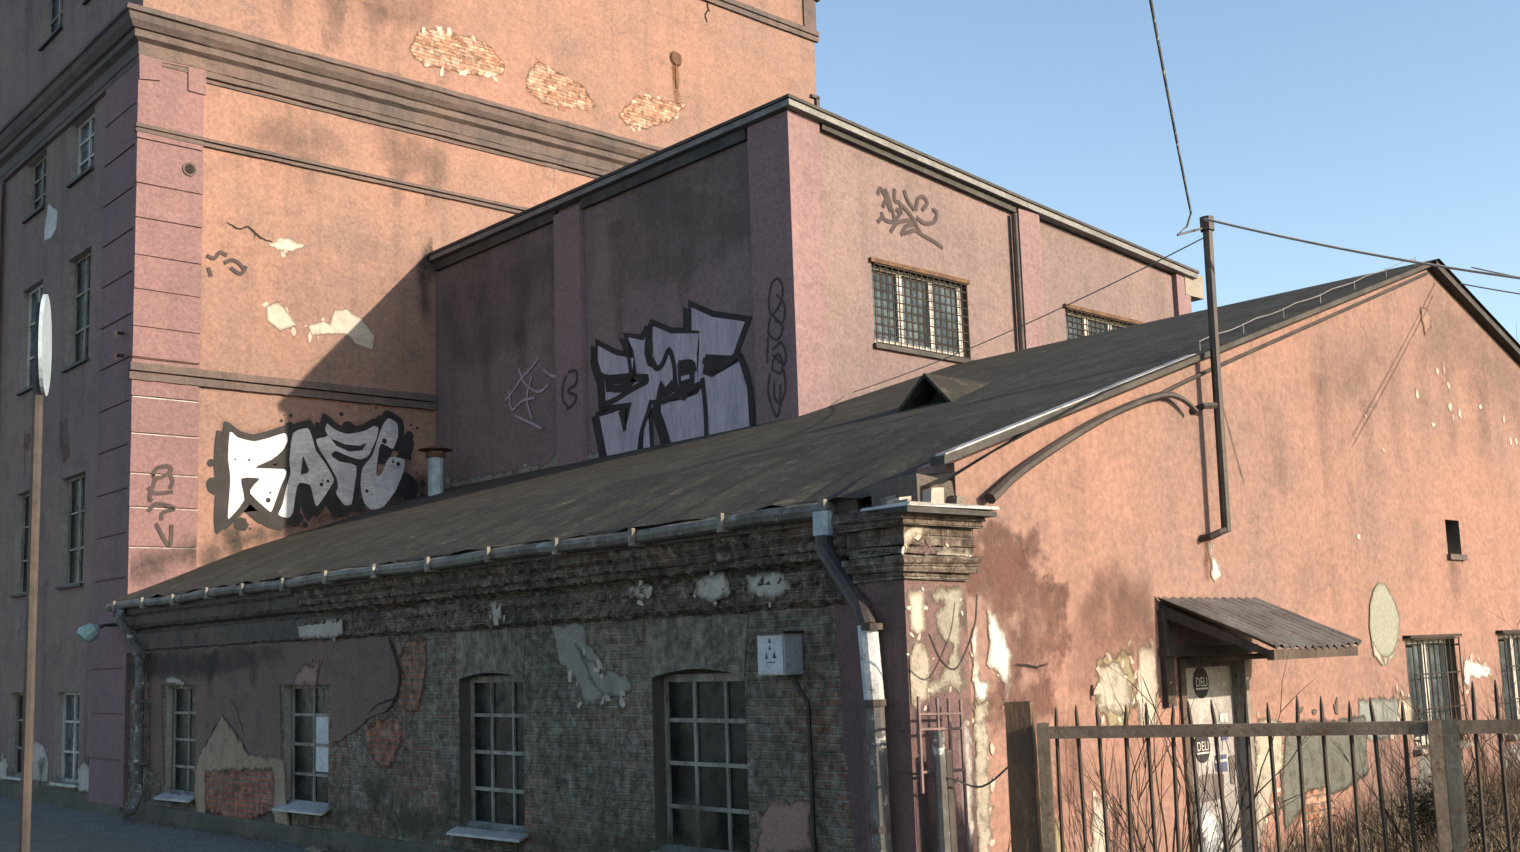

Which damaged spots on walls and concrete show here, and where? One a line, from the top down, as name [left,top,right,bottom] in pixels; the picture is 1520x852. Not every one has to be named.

flaking render [409,26,505,82]
flaking render [526,57,596,114]
flaking render [270,238,308,257]
flaking render [262,302,375,351]
crack [369,635,405,713]
flaking render [549,622,635,709]
flaking render [906,585,1013,852]
leakage [968,521,1071,720]
flaking render [1093,638,1159,739]
flaking render [1370,582,1401,666]
flaking render [194,714,289,826]
spalling [1254,686,1432,848]